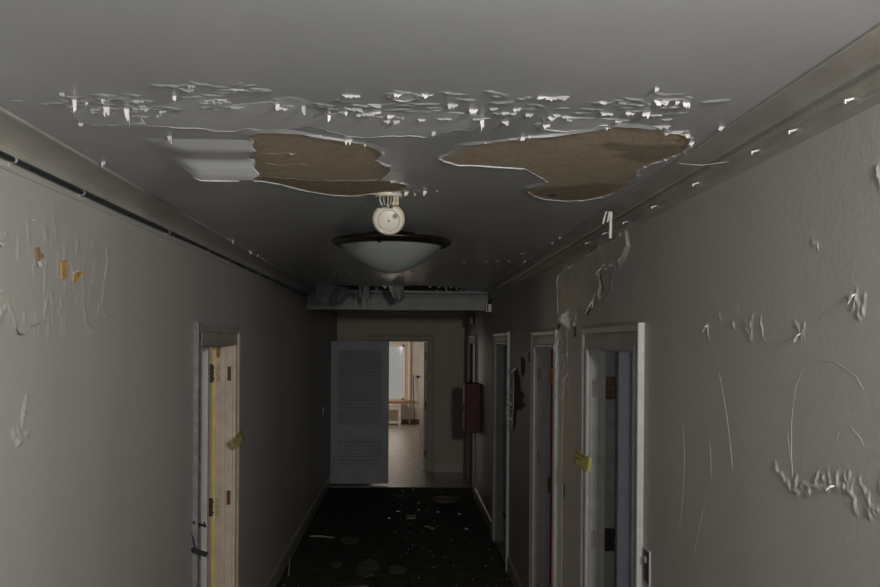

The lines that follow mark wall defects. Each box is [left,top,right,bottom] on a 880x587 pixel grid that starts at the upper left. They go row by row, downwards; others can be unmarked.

peeling [37,81,732,202]
peeling [60,260,84,282]
flaking render [313,272,472,292]
peeling [556,211,630,337]